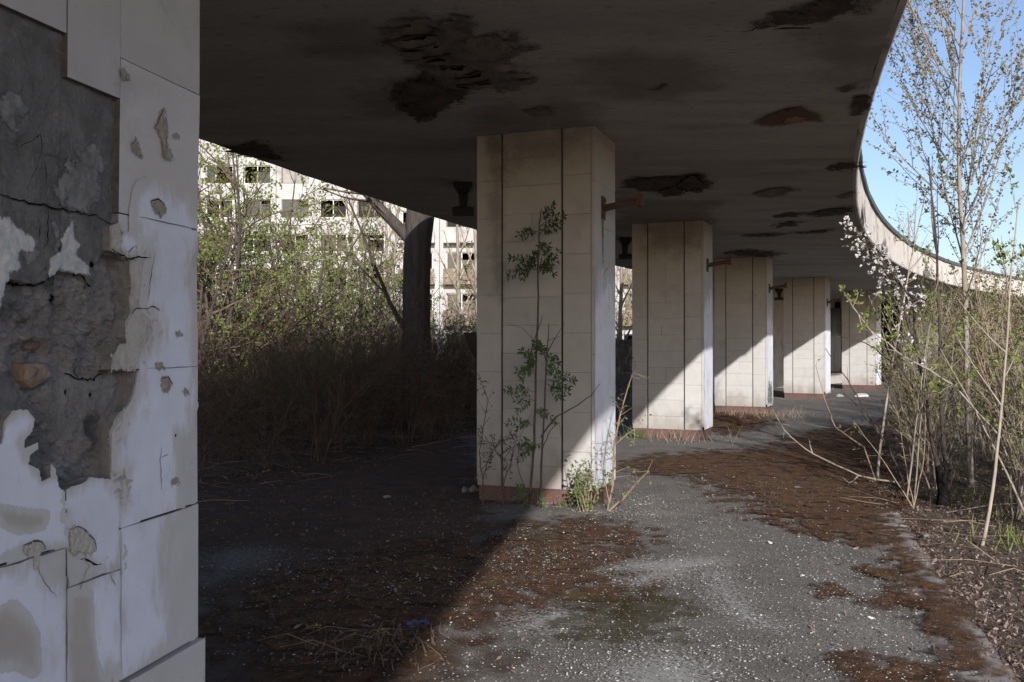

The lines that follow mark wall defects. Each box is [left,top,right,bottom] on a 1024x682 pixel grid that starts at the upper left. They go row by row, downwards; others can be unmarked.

spalling [741,0,860,32]
spalling [376,11,542,123]
spalling [838,85,876,116]
spalling [753,107,824,127]
spalling [223,140,290,161]
spalling [620,174,715,197]
spalling [717,192,866,257]
spalling [0,7,198,682]